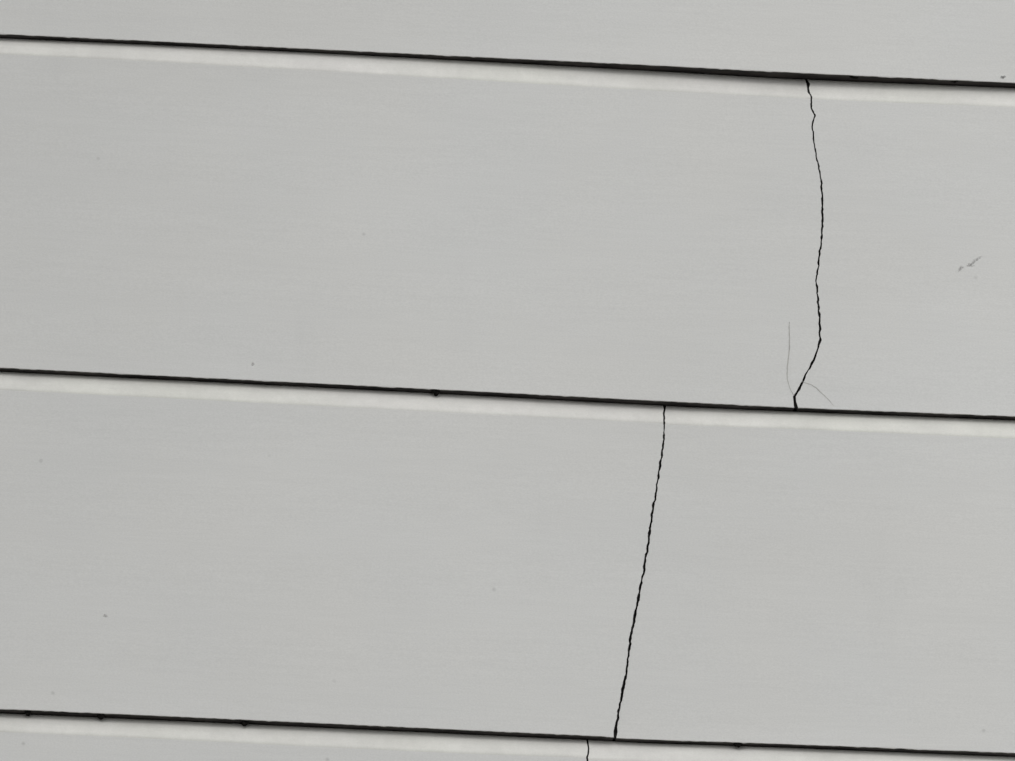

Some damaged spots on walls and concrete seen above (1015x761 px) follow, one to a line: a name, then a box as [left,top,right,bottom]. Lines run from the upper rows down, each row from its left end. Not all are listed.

crack [787,81,834,408]
crack [614,407,666,739]